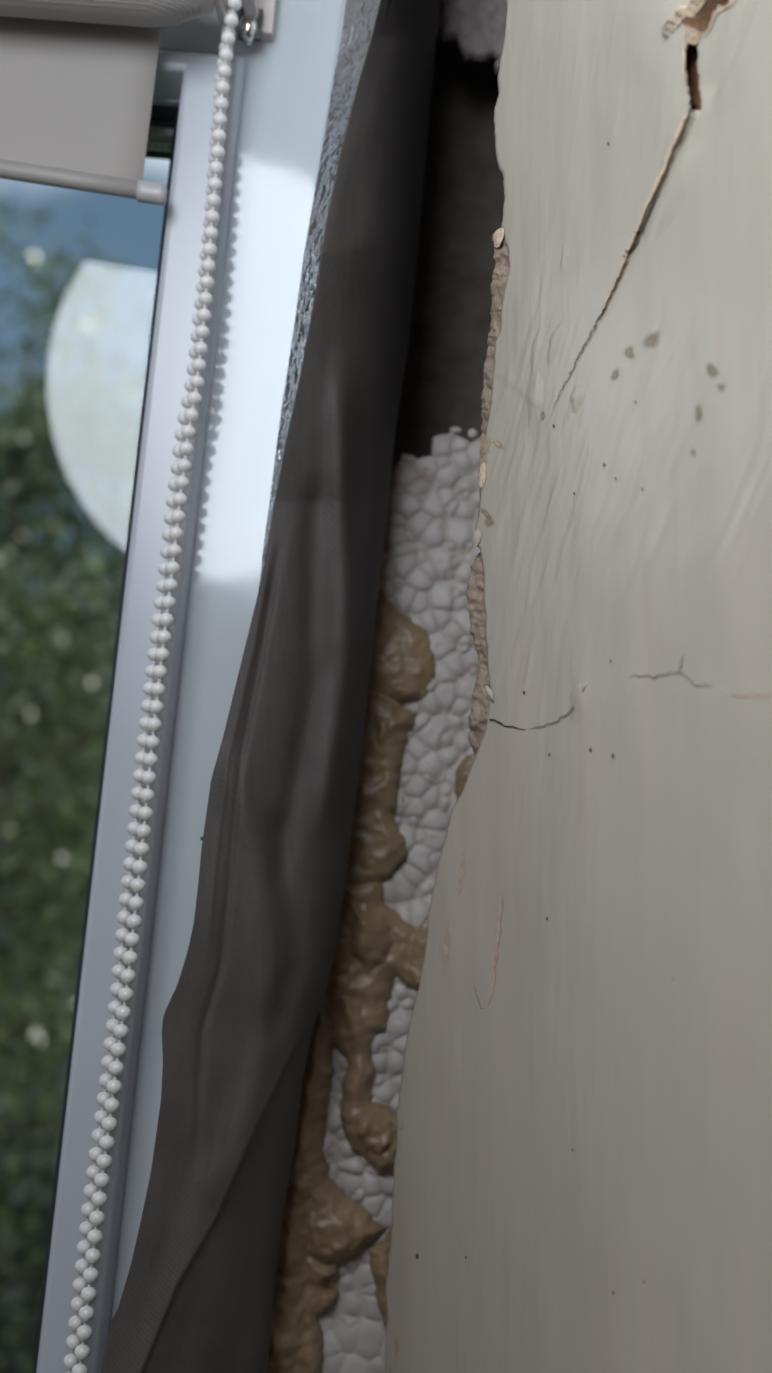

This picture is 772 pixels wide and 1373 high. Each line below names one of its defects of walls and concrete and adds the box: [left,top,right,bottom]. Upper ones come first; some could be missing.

spalling [663,0,734,47]
crack [556,42,702,401]
spalling [464,227,509,782]
crack [631,656,772,697]
crack [489,687,585,730]